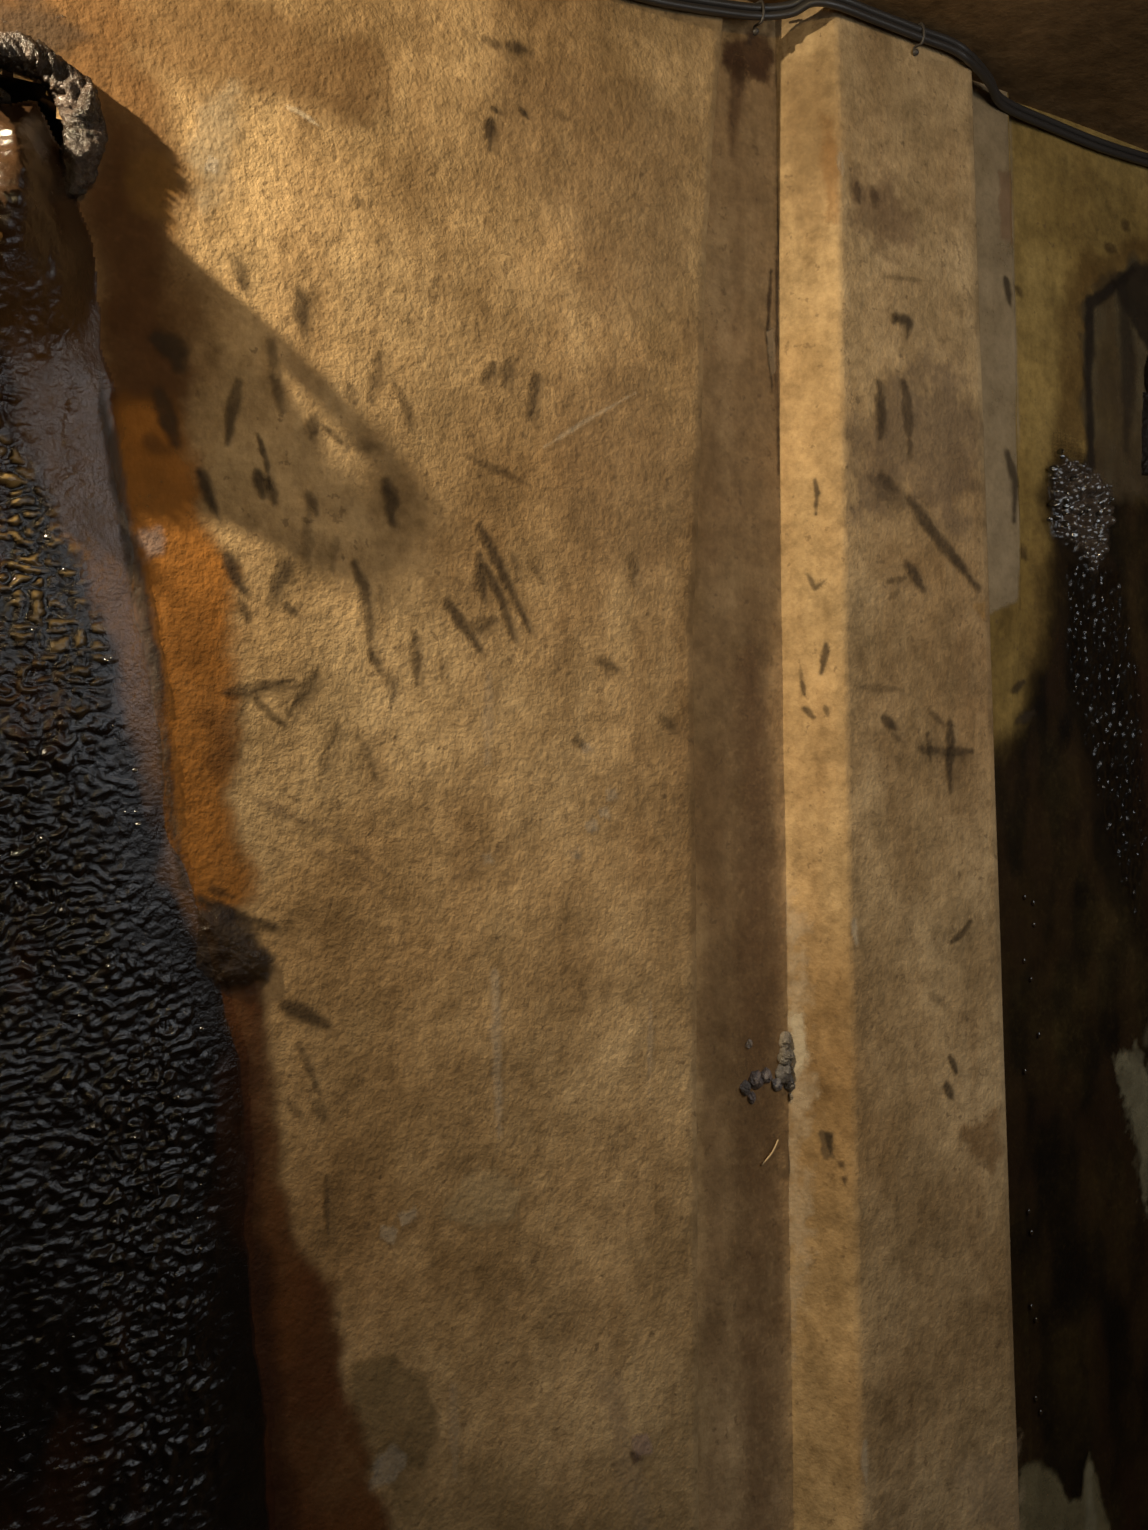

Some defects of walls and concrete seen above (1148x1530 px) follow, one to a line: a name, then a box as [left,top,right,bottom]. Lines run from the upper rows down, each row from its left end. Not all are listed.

leakage [156,390,178,445]
rust [0,0,250,910]
leakage [197,470,217,514]
leakage [254,436,276,500]
leakage [224,552,245,594]
leakage [269,560,294,612]
leakage [224,673,317,713]
leakage [947,721,955,786]
leakage [197,896,277,928]
leakage [994,460,1148,1530]
leakage [945,1055,958,1098]